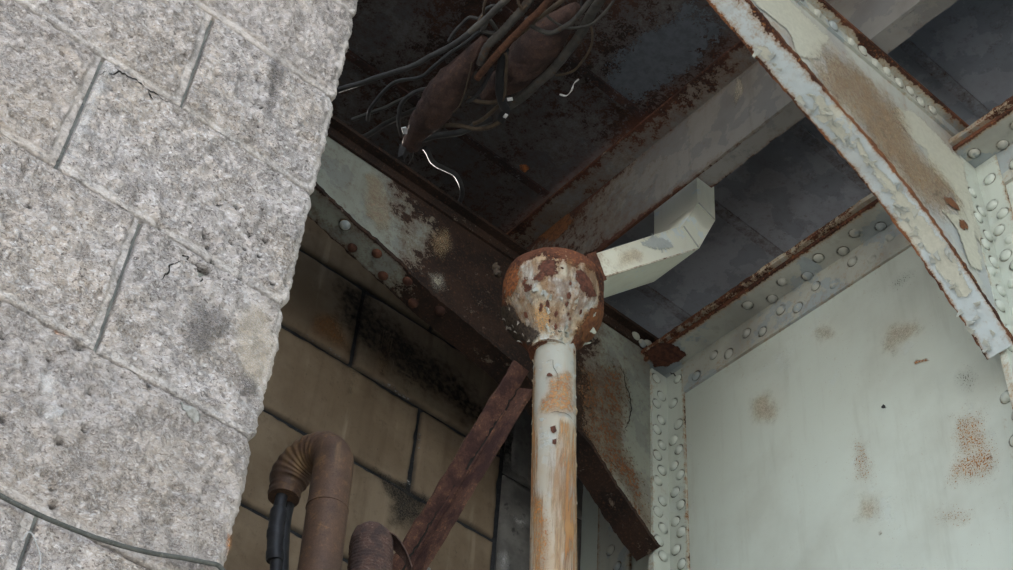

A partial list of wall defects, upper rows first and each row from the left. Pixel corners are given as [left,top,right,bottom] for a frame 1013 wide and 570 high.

crack [100,70,171,103]
peeling [752,44,782,72]
peeling [794,93,988,335]
rust [501,259,603,349]
rust [531,363,650,570]
rust [945,411,999,486]